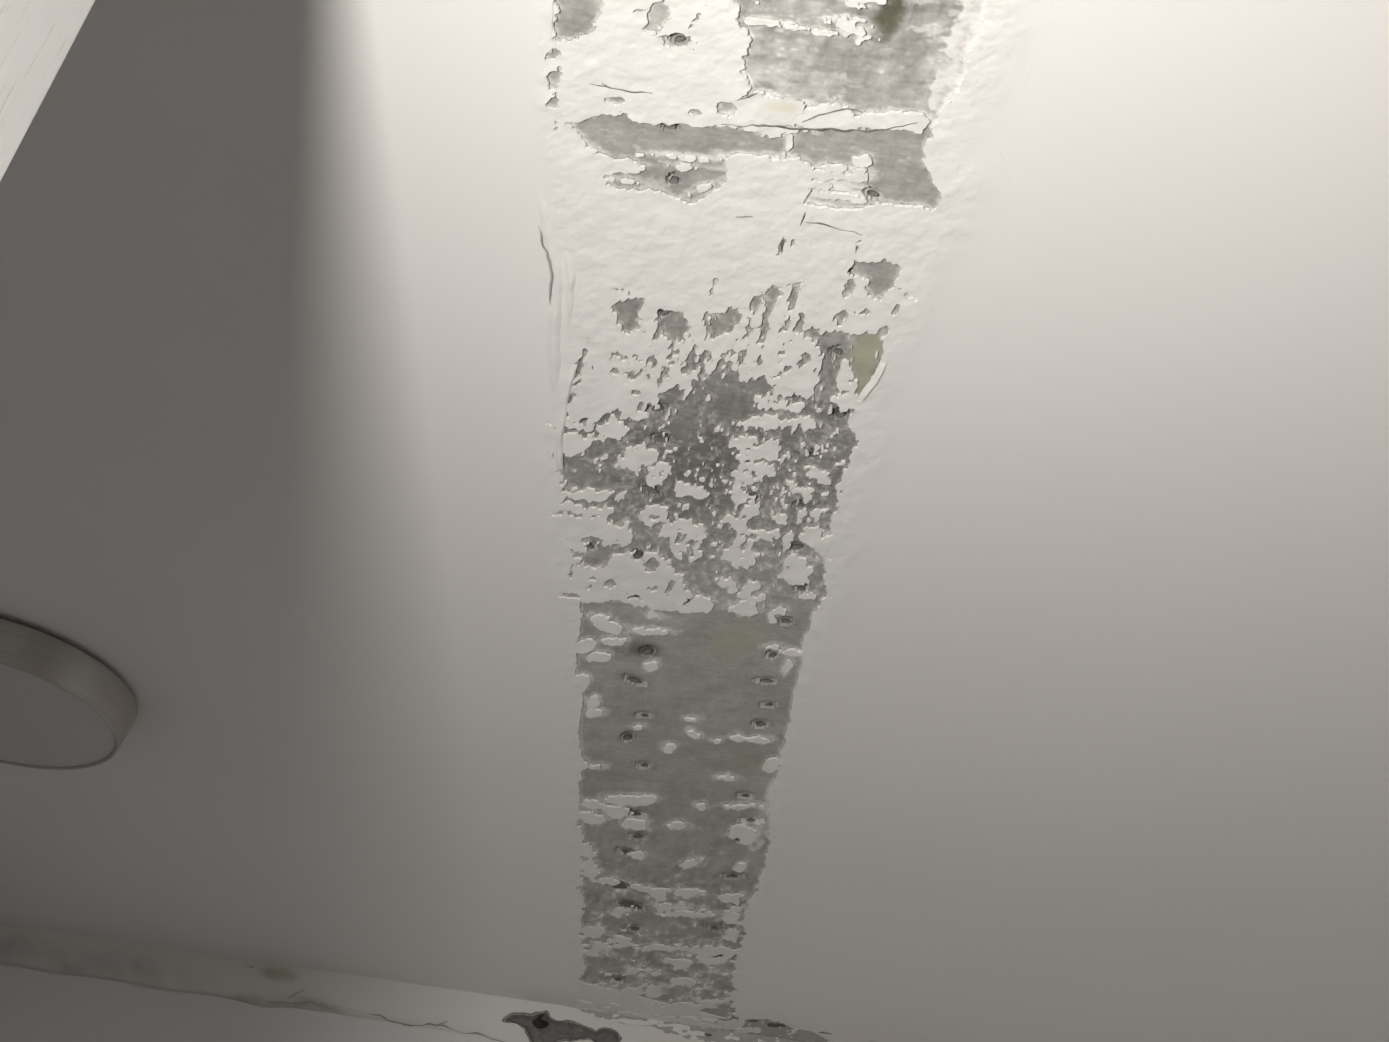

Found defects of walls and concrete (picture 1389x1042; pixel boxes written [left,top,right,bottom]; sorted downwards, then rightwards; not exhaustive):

flaking render [502,0,1053,1042]